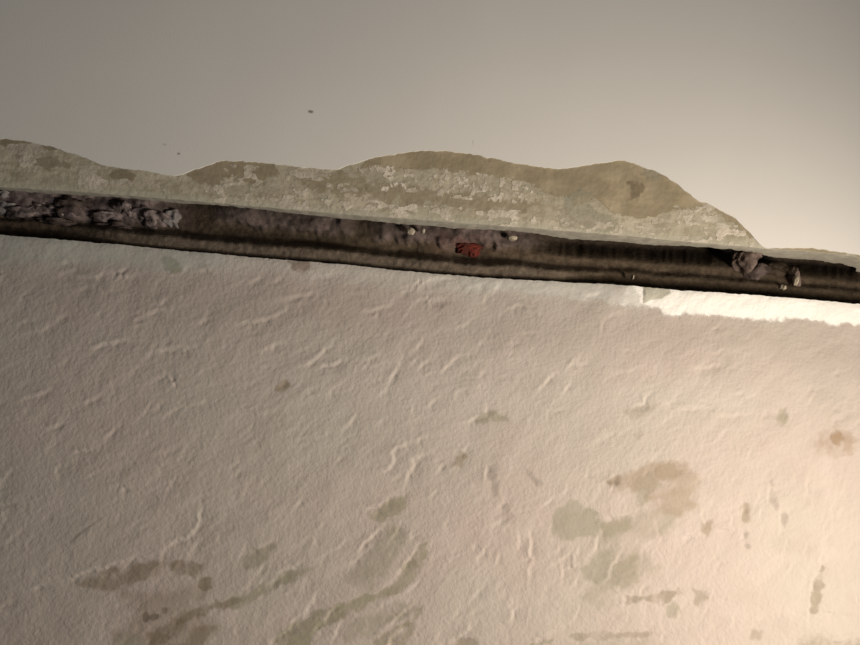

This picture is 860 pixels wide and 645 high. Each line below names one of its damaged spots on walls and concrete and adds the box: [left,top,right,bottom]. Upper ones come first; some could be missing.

peeling [0,139,846,254]